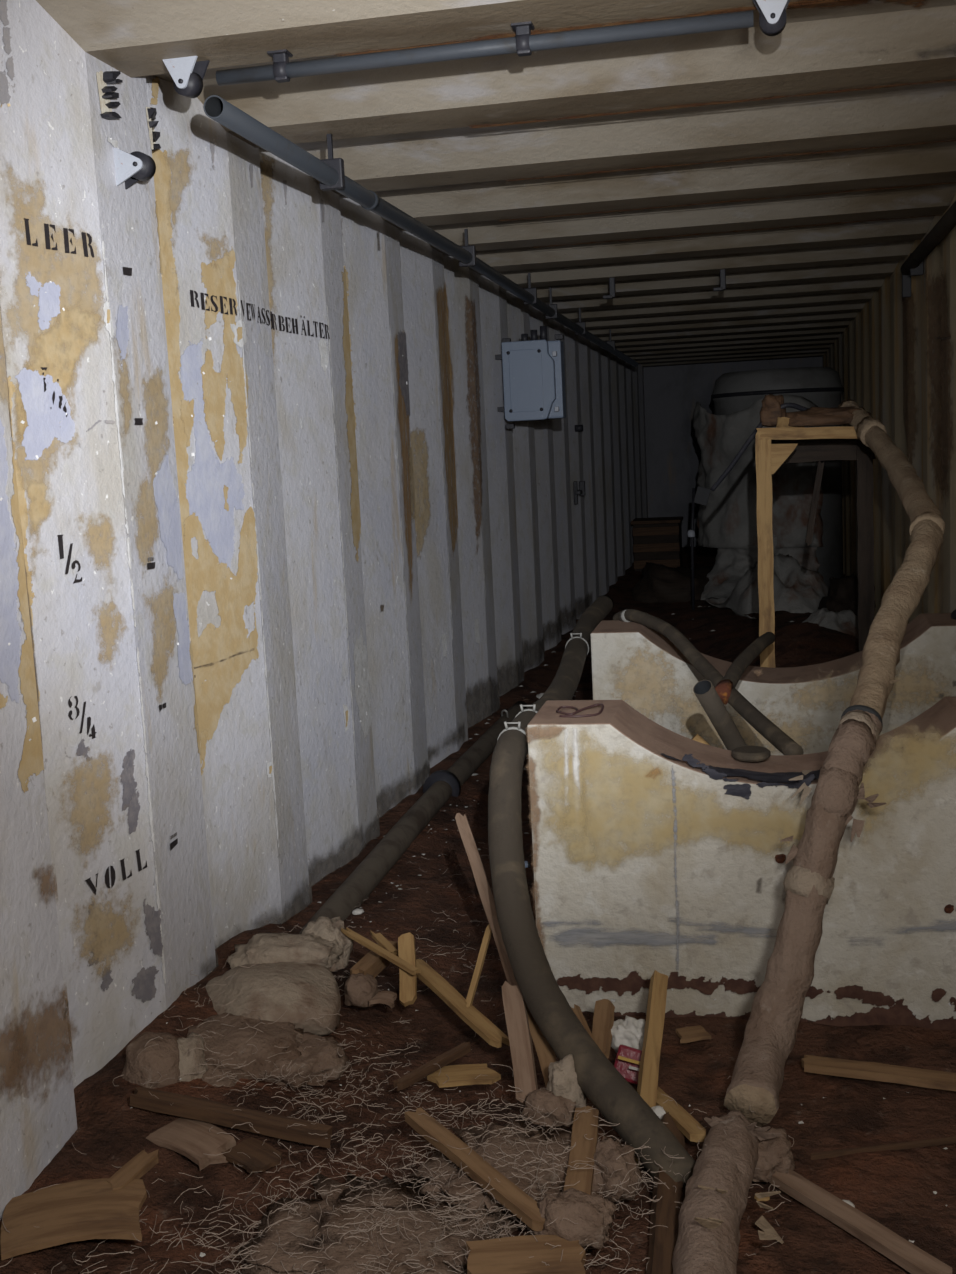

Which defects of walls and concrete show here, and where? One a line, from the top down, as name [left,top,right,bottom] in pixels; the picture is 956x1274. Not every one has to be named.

corrosion [337,33,516,56]
corrosion [531,7,757,35]
corrosion [787,0,926,9]
peeling [0,168,136,792]
peeling [146,77,279,848]
damp [342,266,361,561]
damp [395,335,430,593]
damp [437,288,482,552]
damp [542,729,807,867]
peeling [556,971,650,1016]
peeling [665,972,760,1020]
peeling [800,985,956,1030]